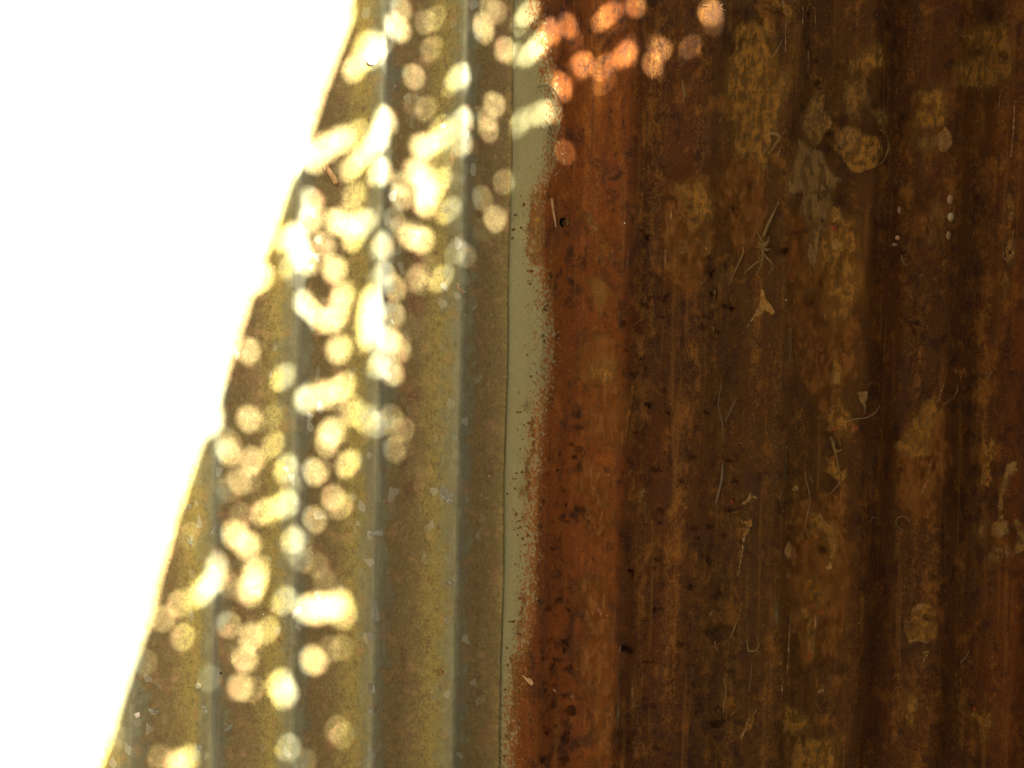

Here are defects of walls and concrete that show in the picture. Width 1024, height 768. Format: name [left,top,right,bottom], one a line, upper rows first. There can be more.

rust [499,0,1024,768]